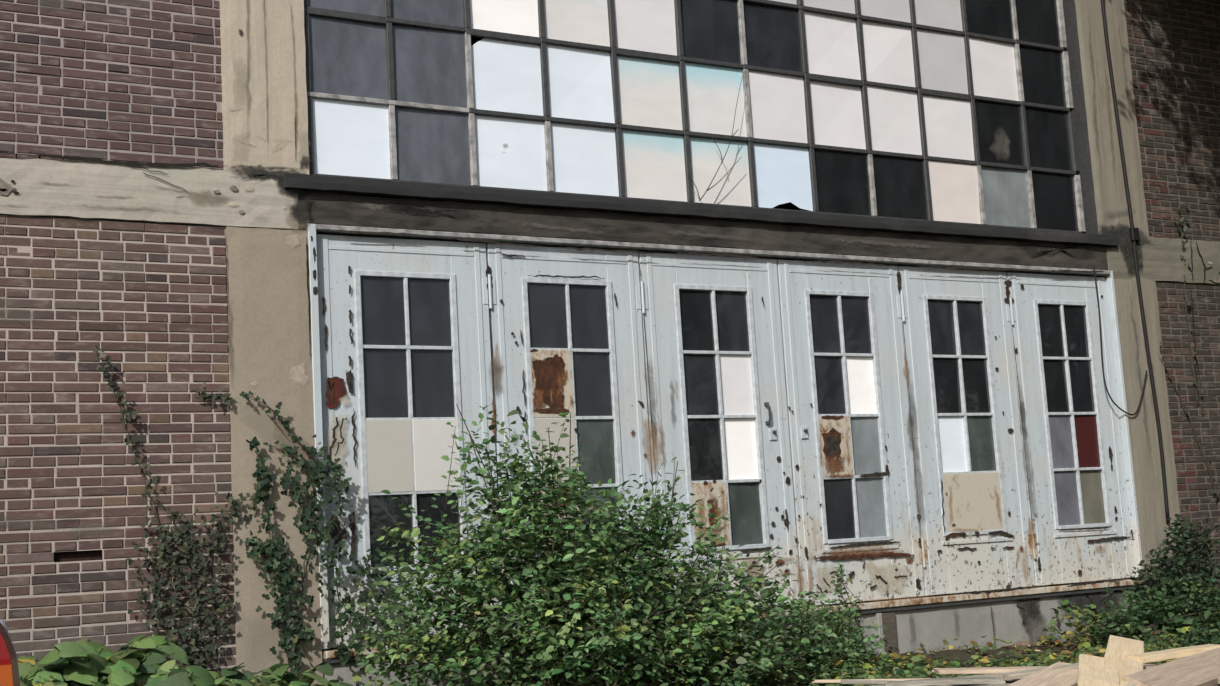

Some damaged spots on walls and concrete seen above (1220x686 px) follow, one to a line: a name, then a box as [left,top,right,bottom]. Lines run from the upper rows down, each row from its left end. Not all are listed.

spalling [0,179,19,196]
leakage [233,156,311,227]
rust [1004,280,1014,305]
rust [530,349,569,414]
rust [740,325,925,605]
rust [937,321,1033,564]
rust [701,480,726,548]
peeling [770,507,800,555]
peeling [807,557,922,607]
rust [959,557,1041,595]
rust [1068,570,1129,587]